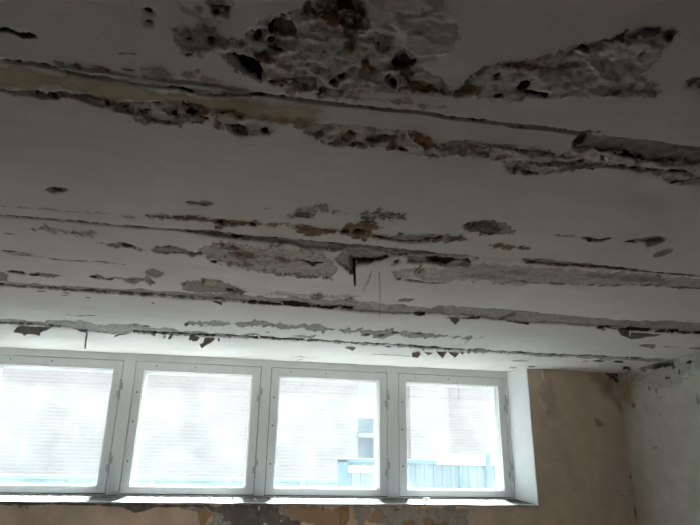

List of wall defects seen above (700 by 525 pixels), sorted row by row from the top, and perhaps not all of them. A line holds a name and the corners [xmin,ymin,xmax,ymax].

flaking render [227,0,461,99]
damp [0,68,313,126]
rust [145,214,382,242]
flaking render [464,219,516,236]
peeling [626,235,672,257]
peeling [0,270,59,281]
peeling [123,268,164,304]
flaking render [181,278,244,295]
flaking render [100,241,700,289]
peeling [185,319,486,356]
peeling [0,496,301,525]
peeling [354,497,467,525]